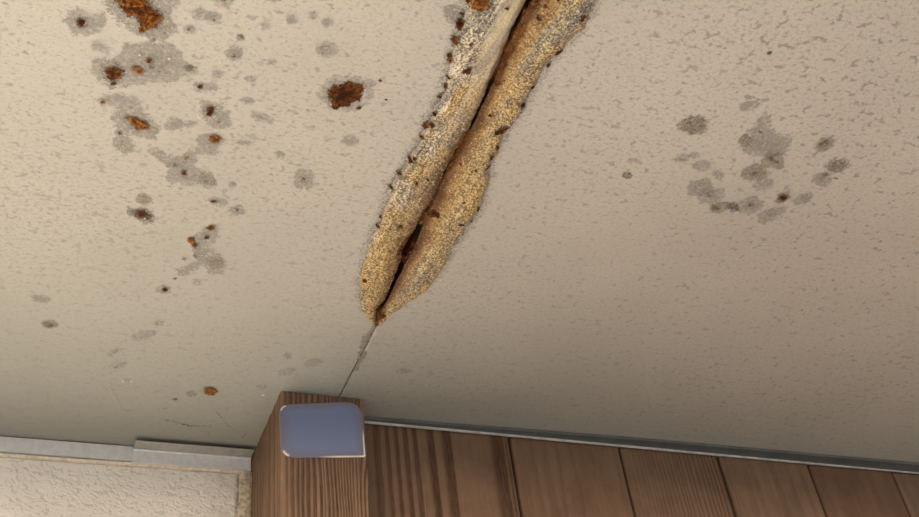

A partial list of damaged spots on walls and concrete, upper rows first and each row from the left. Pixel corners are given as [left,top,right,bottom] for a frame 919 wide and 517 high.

corrosion [63,0,196,140]
leakage [225,34,244,62]
corrosion [319,76,382,112]
corrosion [446,0,493,63]
corrosion [493,0,548,85]
corrosion [127,207,158,224]
corrosion [153,101,231,188]
crack [339,0,531,397]
leakage [677,115,792,223]
leakage [815,137,835,152]
leakage [811,158,849,186]
leakage [156,226,226,293]